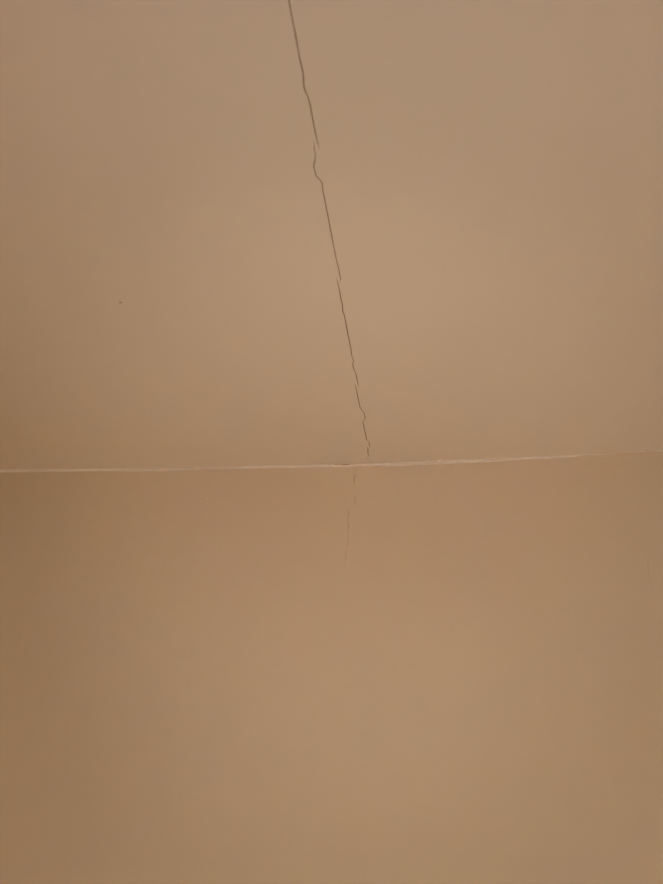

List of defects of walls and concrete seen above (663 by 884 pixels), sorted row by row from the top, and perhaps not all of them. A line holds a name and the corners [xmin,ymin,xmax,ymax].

crack [289,0,370,490]